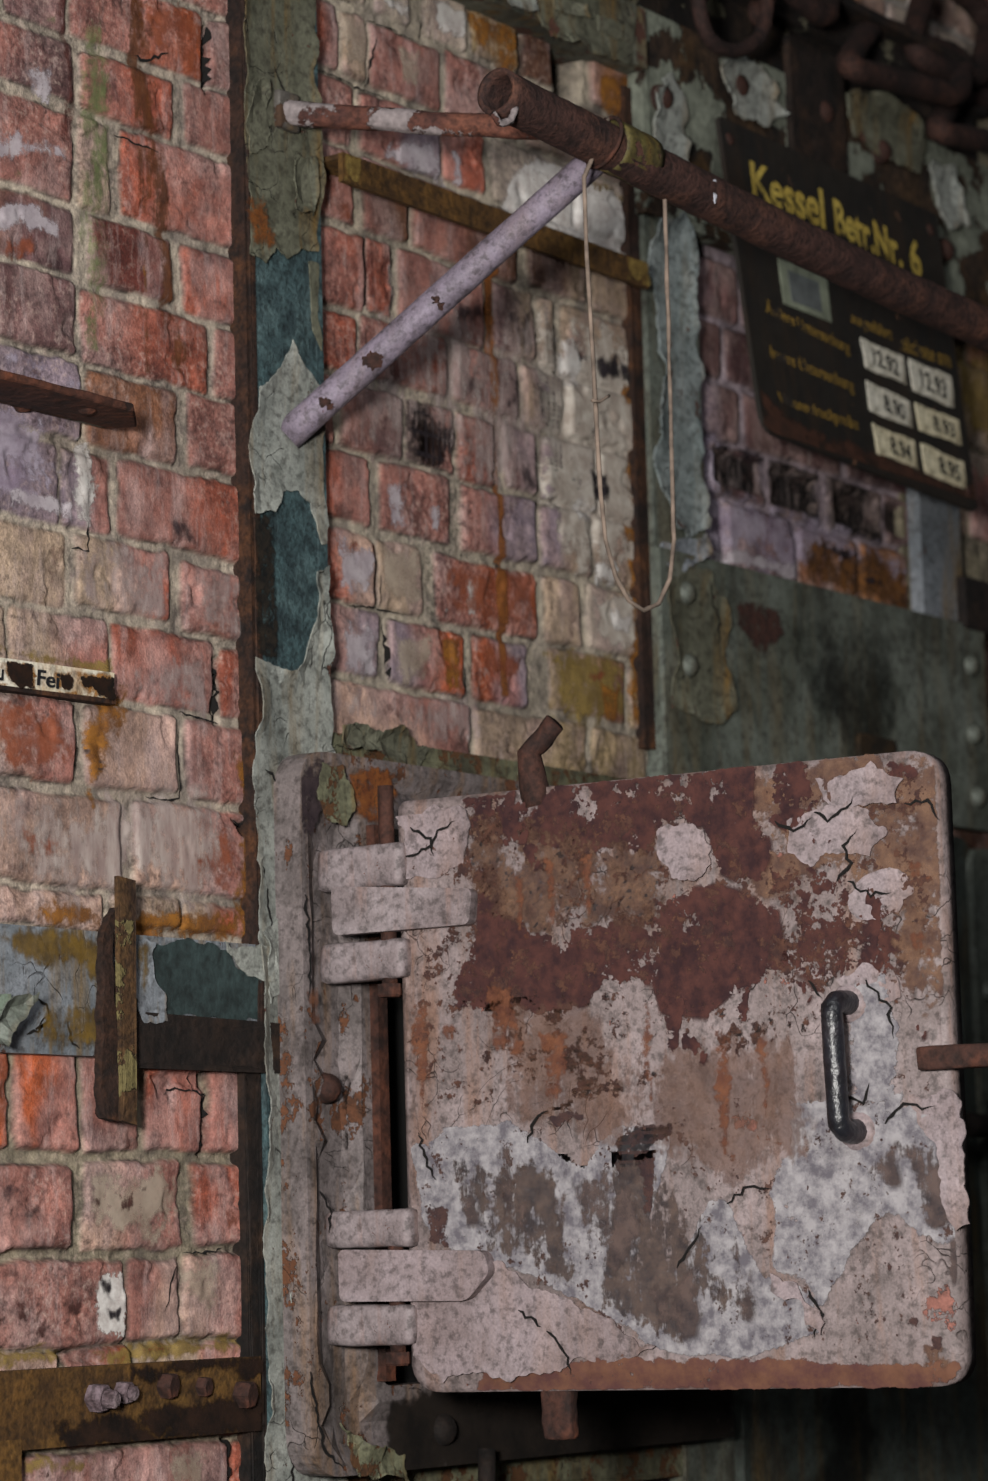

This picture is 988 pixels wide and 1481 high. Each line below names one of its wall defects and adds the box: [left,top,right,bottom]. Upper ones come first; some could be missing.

corrosion [483,268,509,696]
corrosion [553,181,656,751]
peeling [647,211,740,724]
corrosion [26,980,280,1481]
peeling [136,340,429,1481]
crack [518,1310,571,1374]
corrosion [407,754,943,1107]
peeling [411,962,970,1383]
crack [727,1185,770,1204]
peeling [787,761,914,920]
crack [865,980,894,1035]
crack [848,1084,933,1124]